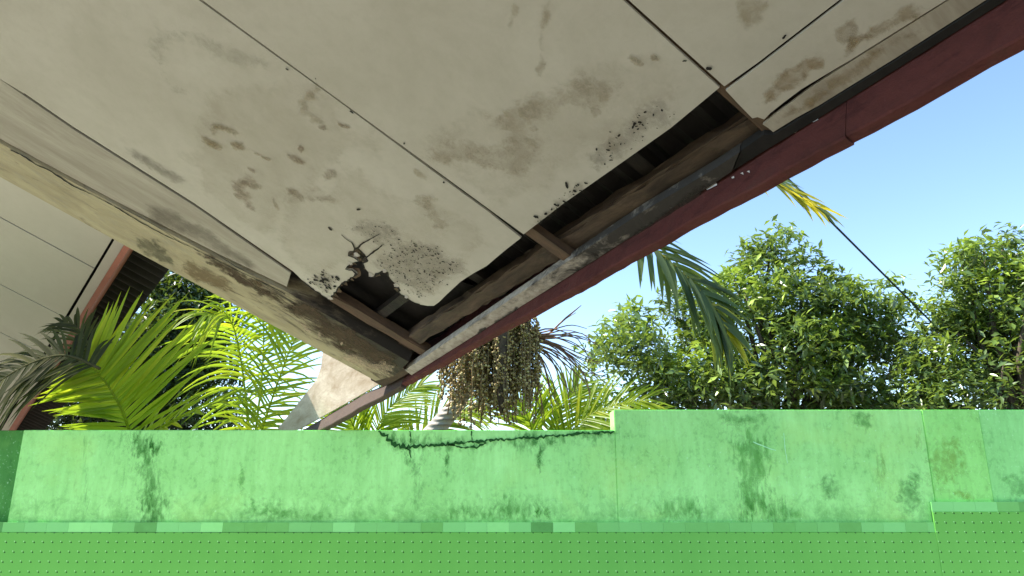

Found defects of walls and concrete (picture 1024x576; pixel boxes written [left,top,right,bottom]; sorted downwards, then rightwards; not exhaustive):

leakage [596,106,675,165]
leakage [356,224,458,297]
crack [378,431,615,457]